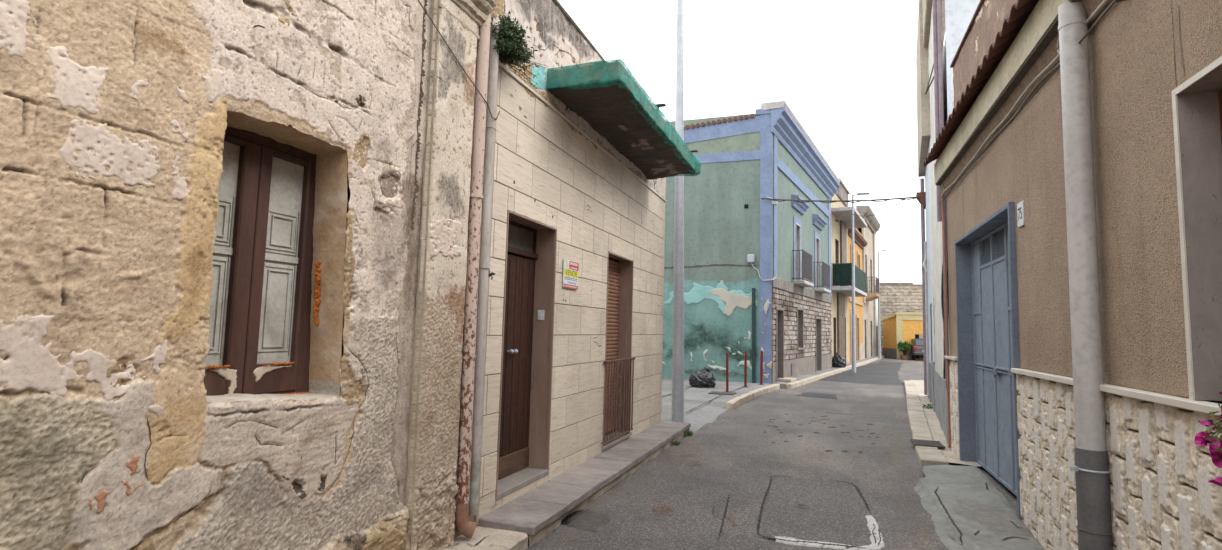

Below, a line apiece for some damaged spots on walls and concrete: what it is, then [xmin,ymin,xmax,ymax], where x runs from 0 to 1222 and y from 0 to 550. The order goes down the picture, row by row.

flaking render [0,0,190,200]
flaking render [0,314,168,402]
peeling [205,368,237,394]
peeling [253,365,292,382]
spalling [283,474,327,499]
spalling [130,538,156,550]